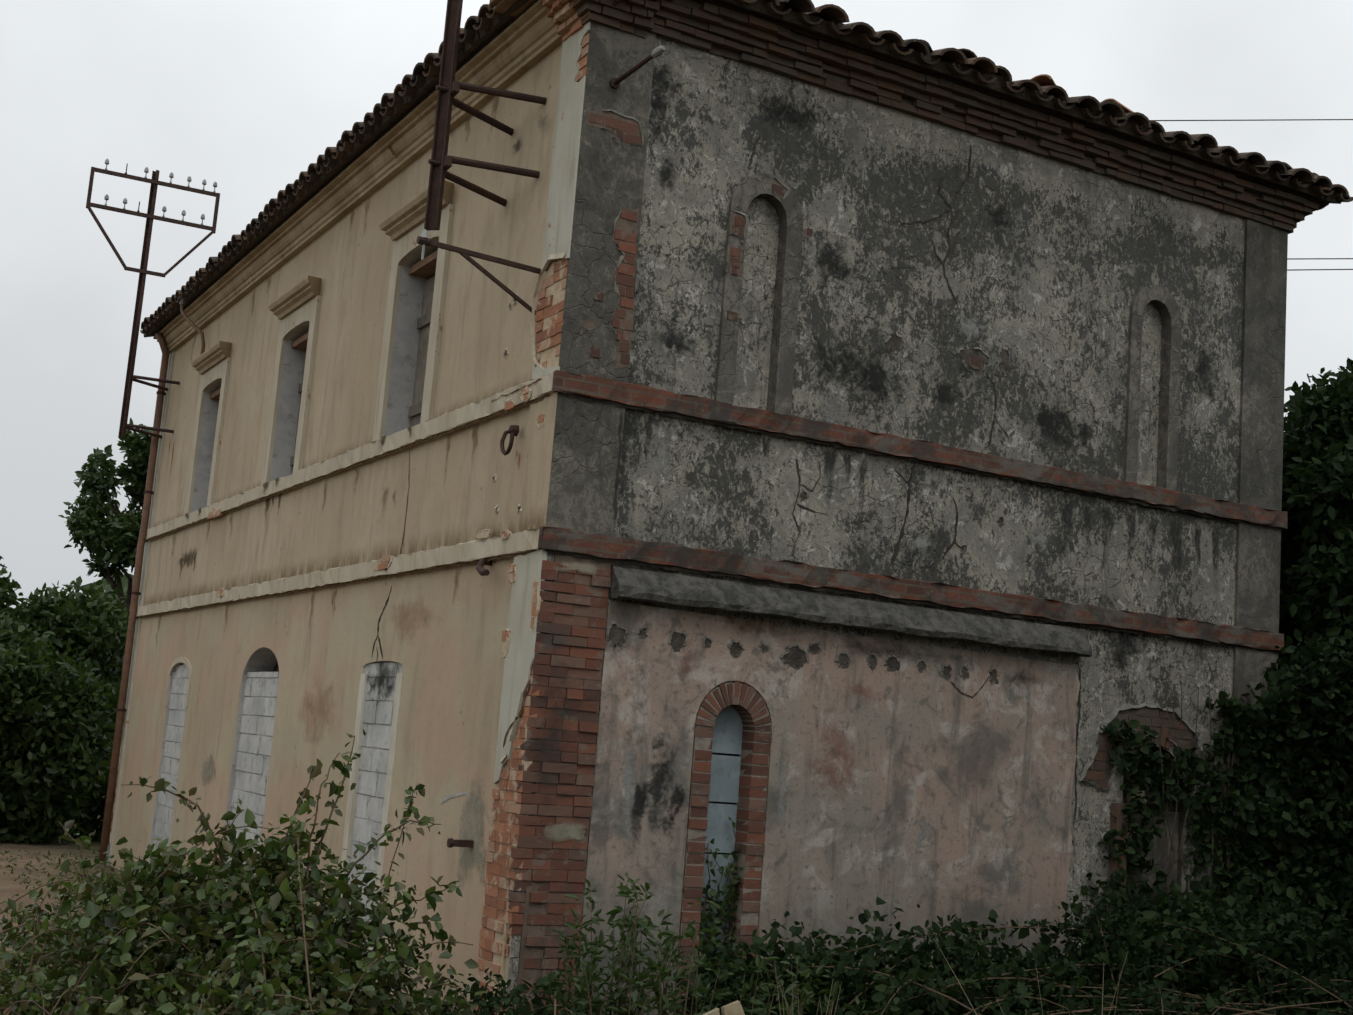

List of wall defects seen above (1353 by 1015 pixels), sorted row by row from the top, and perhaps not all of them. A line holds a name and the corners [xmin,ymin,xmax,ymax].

spalling [587,109,644,149]
spalling [509,252,568,368]
spalling [582,208,639,369]
damp [818,241,856,289]
damp [819,341,901,401]
damp [1037,406,1094,448]
crack [792,459,827,550]
damp [824,451,867,506]
spalling [530,575,542,634]
spalling [1079,703,1210,791]
damp [624,754,647,837]
damp [663,787,685,829]